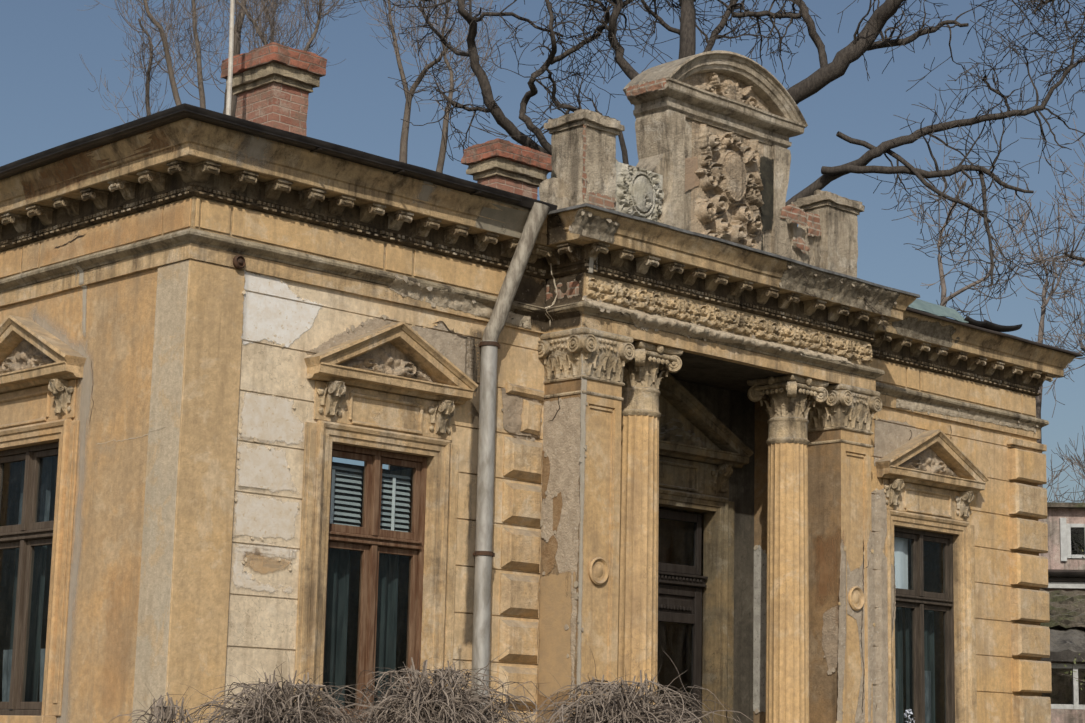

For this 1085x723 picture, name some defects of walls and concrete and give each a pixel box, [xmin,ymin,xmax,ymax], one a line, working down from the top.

peeling [241,270,324,348]
spalling [779,202,900,317]
peeling [232,390,304,593]
peeling [501,388,581,697]